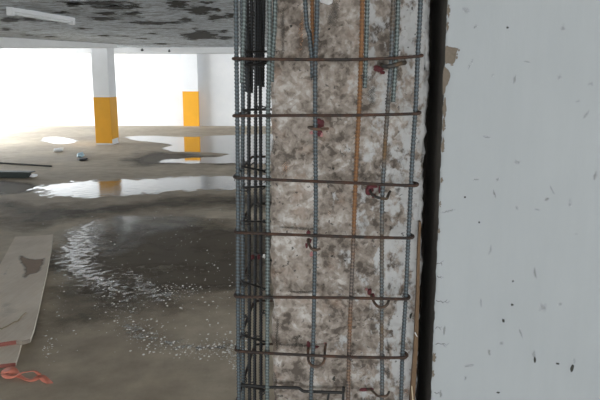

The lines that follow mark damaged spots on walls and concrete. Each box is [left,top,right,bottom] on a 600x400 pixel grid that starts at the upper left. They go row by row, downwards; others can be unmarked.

peeling [441,46,460,152]